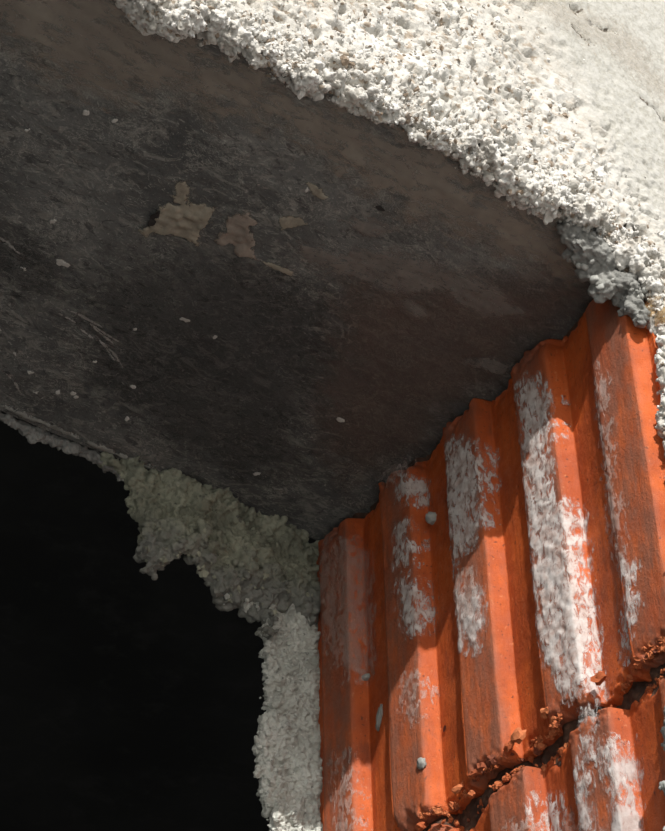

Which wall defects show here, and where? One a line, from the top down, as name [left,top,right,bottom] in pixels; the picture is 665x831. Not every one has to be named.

peeling [138,181,216,246]
peeling [214,211,294,276]
water stain [394,464,431,509]
water stain [393,519,438,639]
water stain [454,586,484,657]
water stain [444,434,501,577]
water stain [514,372,607,725]
water stain [618,558,644,667]
crack [415,636,665,831]
water stain [526,792,567,831]
water stain [573,733,642,831]